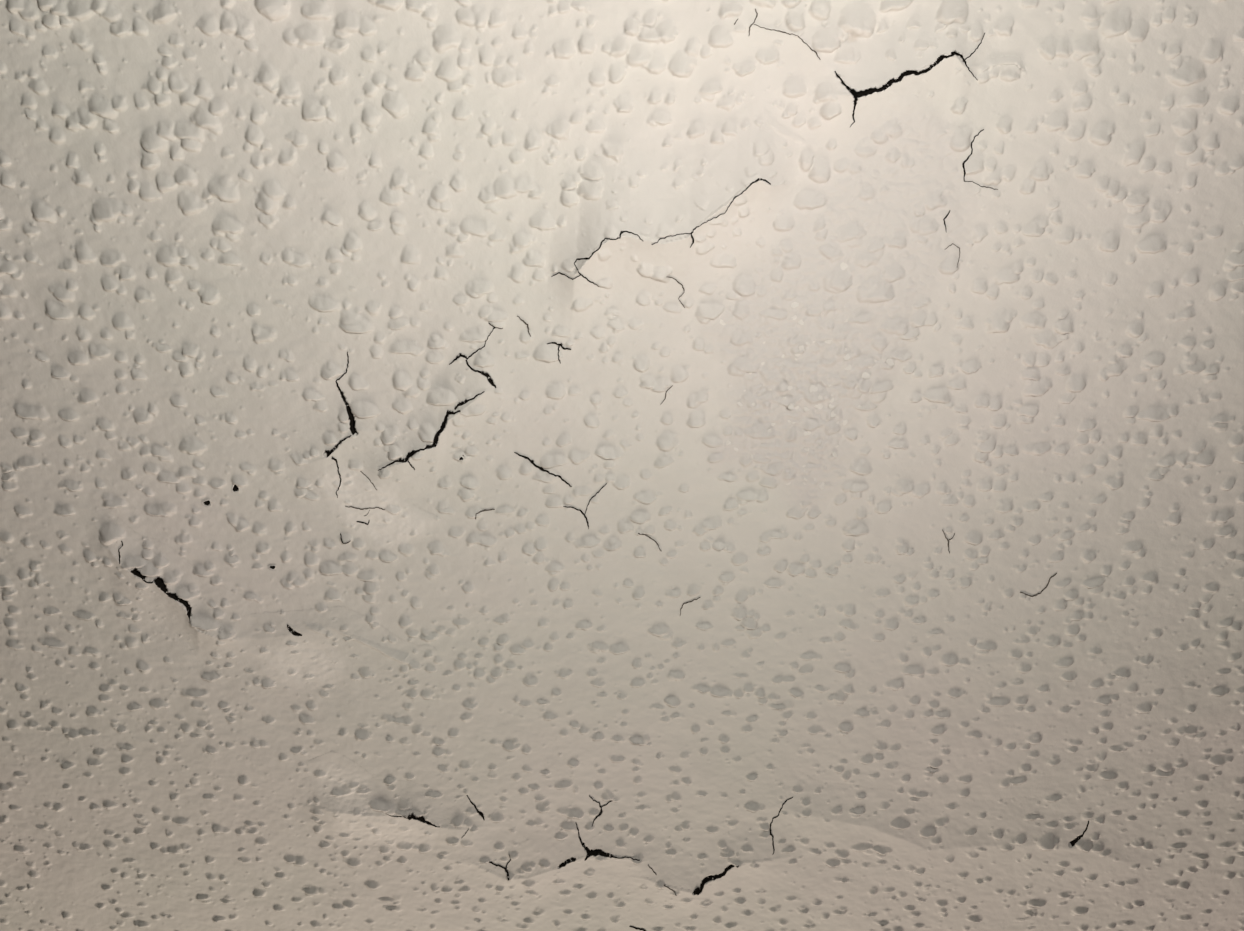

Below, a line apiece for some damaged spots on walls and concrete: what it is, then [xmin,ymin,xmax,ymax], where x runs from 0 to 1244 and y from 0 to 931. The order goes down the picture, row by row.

crack [734,9,985,127]
crack [551,178,771,287]
spalling [687,82,984,523]
crack [325,316,571,544]
crack [118,541,191,620]
crack [387,795,485,839]
crack [489,855,511,880]
crack [559,796,739,896]
crack [769,797,793,854]